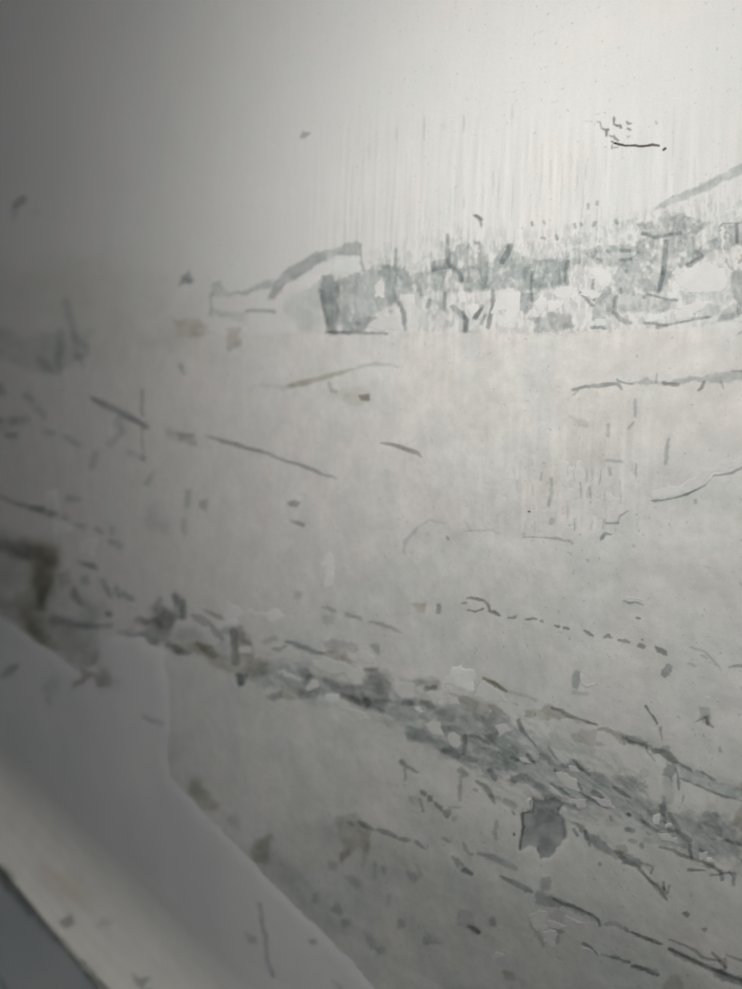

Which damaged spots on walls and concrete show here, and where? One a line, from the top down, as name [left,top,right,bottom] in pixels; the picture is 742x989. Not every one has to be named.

crack [614,143,666,151]
peeling [281,257,362,296]
peeling [374,277,386,299]
peeling [367,294,415,332]
peeling [457,291,521,328]
peeling [533,267,612,315]
peeling [646,226,729,322]
peeling [272,647,375,723]
peeling [395,665,508,748]
peeling [547,765,616,812]
peeling [652,813,679,845]